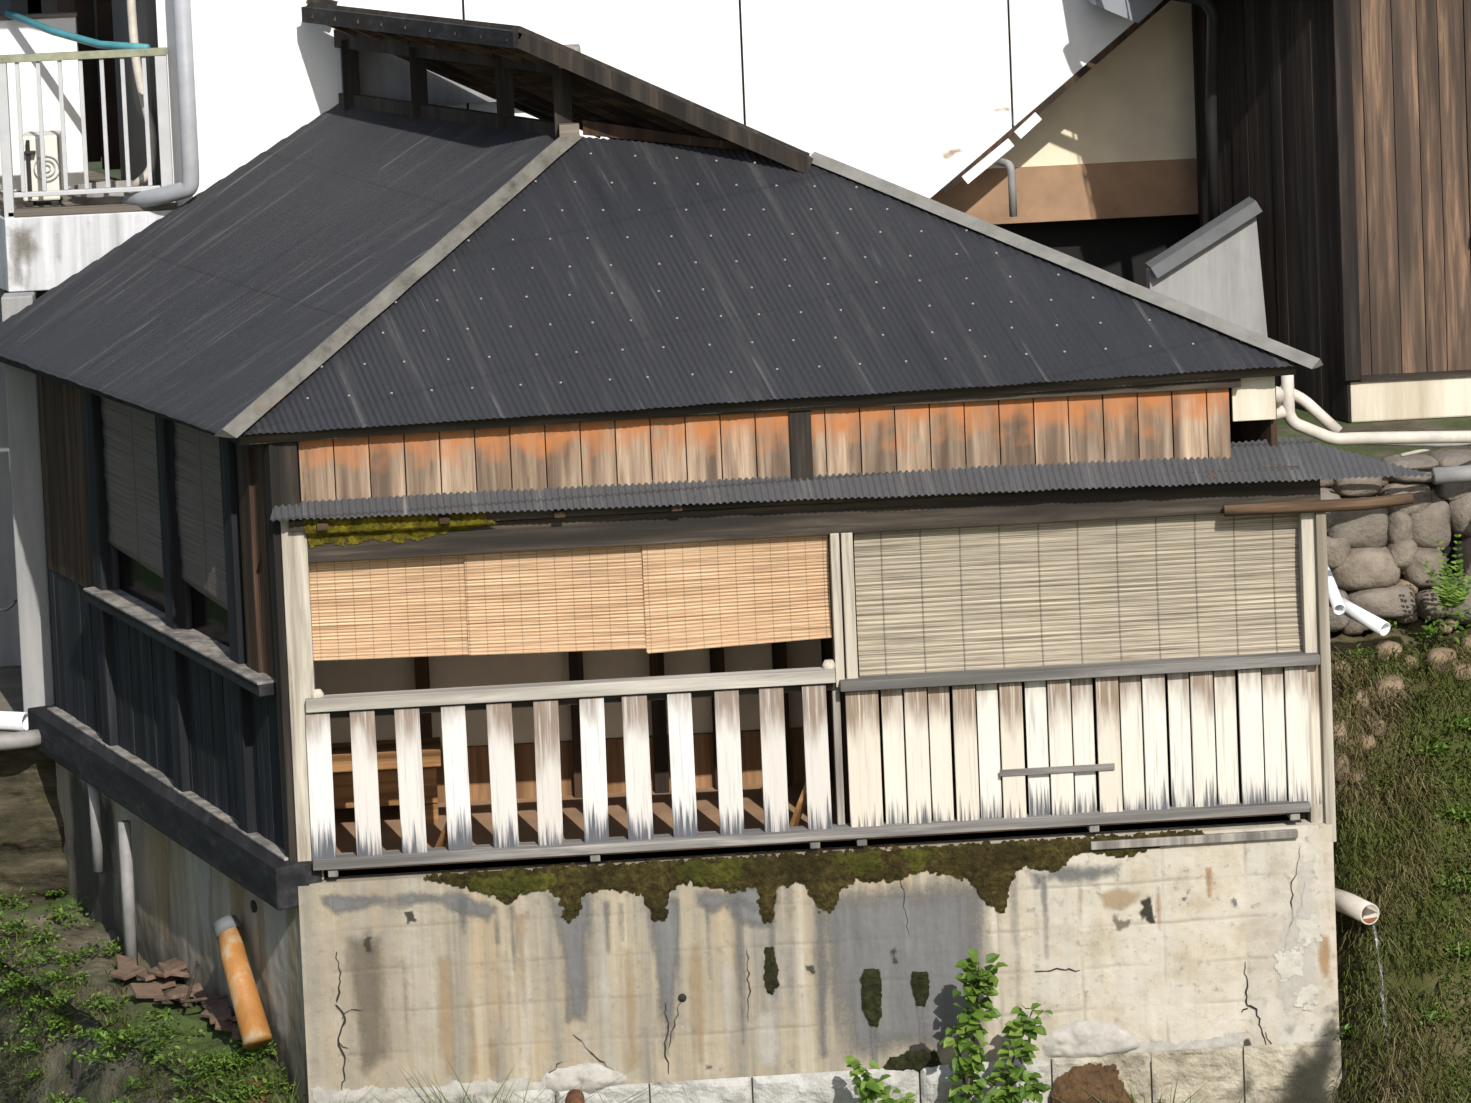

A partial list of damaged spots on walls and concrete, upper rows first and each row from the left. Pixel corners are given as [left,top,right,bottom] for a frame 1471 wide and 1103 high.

crack [335,952,362,1090]
water stain [354,942,382,1067]
water stain [323,894,513,922]
water stain [553,897,609,1021]
water stain [650,900,679,1026]
crack [664,1003,681,1074]
water stain [699,887,774,991]
water stain [816,885,983,1054]
crack [1241,963,1272,1045]
crack [1283,848,1305,953]